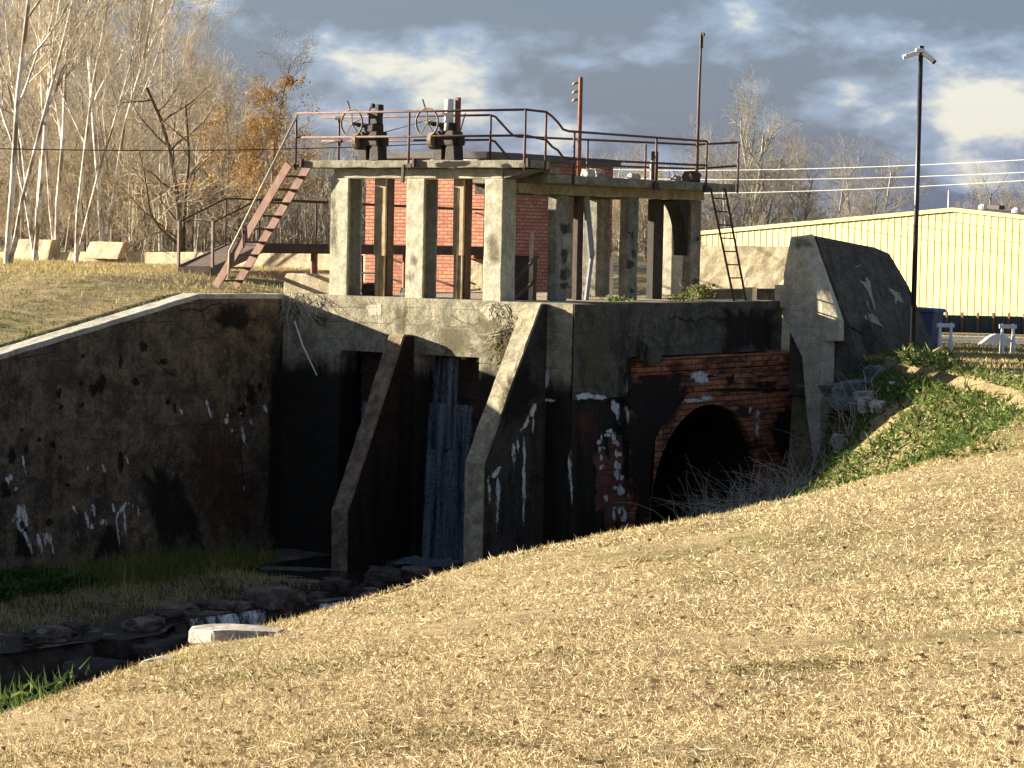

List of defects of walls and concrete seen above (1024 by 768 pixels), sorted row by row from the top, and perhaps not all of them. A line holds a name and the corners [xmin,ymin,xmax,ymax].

leakage [13,505,54,558]
leakage [72,468,204,559]
efflorescence [206,399,253,443]
efflorescence [487,466,501,528]
leakage [500,365,554,521]
peeling [592,427,629,533]